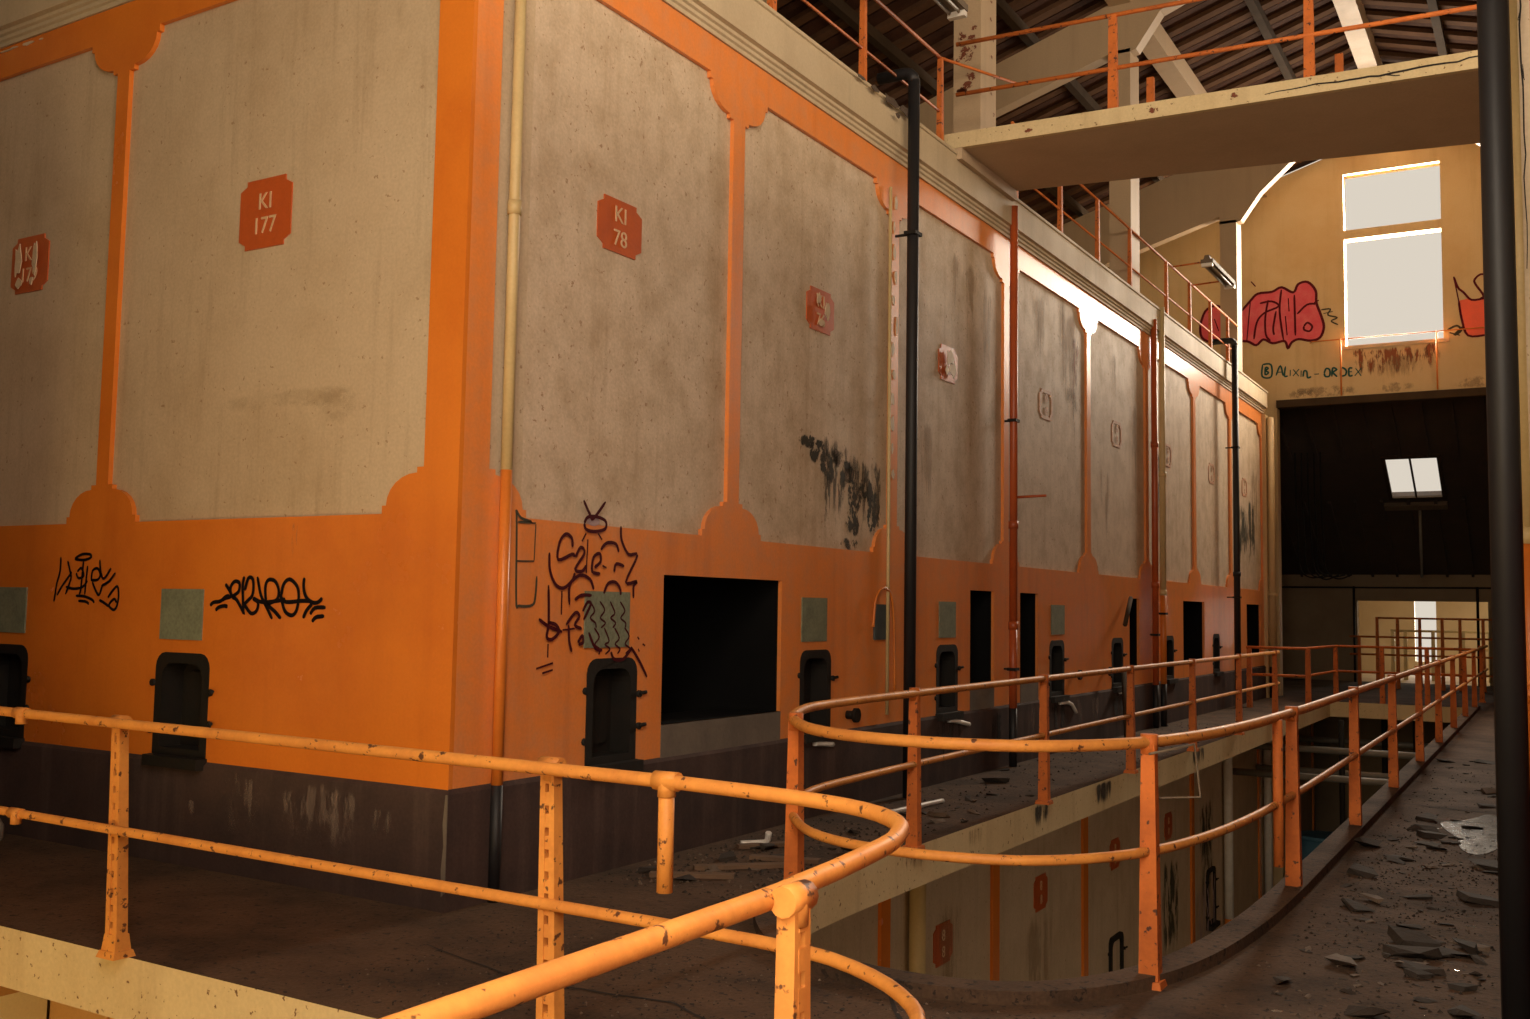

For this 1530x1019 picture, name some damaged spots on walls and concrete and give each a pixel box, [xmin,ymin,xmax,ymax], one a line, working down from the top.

water stain [799,435,880,549]